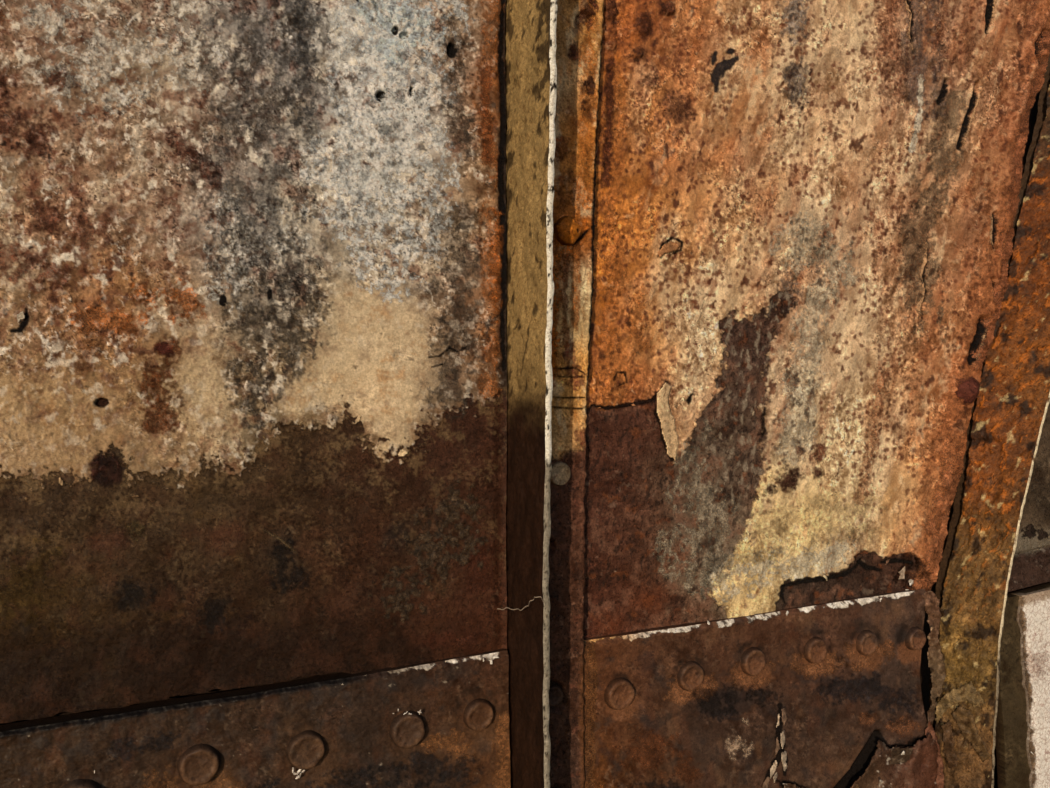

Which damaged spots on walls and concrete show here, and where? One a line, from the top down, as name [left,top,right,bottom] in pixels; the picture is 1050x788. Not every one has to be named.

crack [985,0,996,34]
crack [937,79,980,150]
leakage [22,0,482,429]
rust [551,0,651,400]
crack [989,214,998,250]
rust [0,201,206,381]
crack [967,281,997,365]
rust [138,336,186,435]
rust [766,443,827,494]
rust [833,149,1017,788]
peeling [548,290,796,788]
peeling [775,550,928,616]